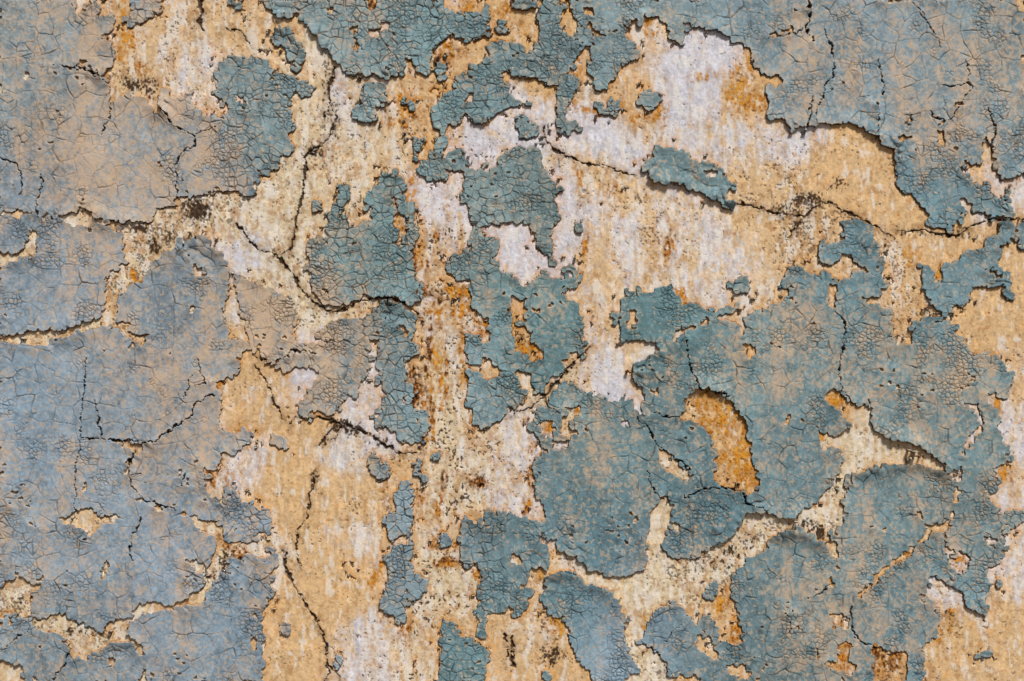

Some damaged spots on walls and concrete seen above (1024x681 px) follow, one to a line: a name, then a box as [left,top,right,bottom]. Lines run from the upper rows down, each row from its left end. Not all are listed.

crack [80,359,215,558]
crack [283,479,333,674]
crack [236,67,419,316]
crack [255,358,417,454]
peeling [0,0,684,562]
rust [429,538,459,569]
rust [409,232,488,444]
peeling [0,339,947,681]
rust [469,476,485,489]
rust [696,387,759,495]
peeling [619,13,1024,514]
peeling [918,521,1024,681]